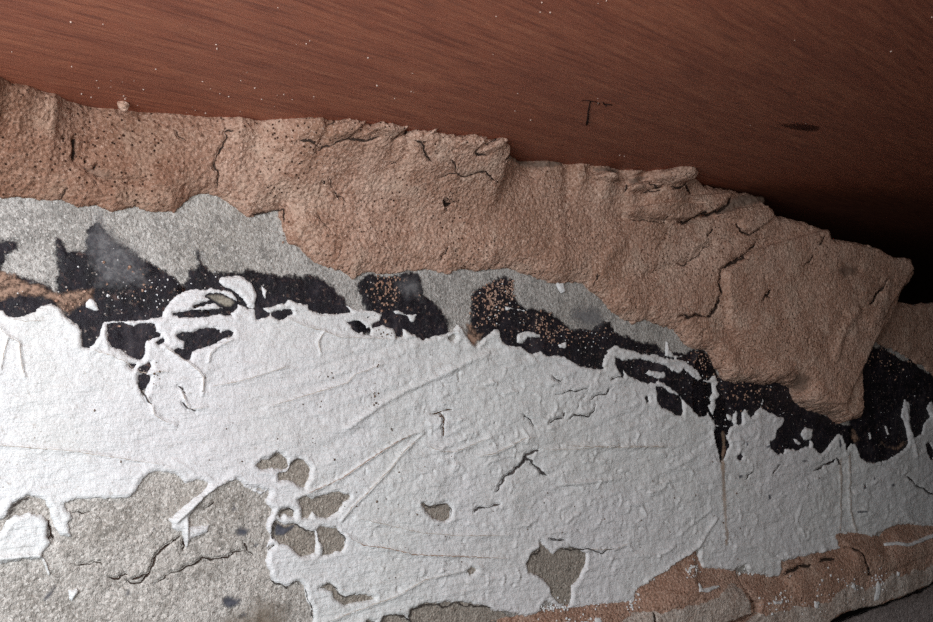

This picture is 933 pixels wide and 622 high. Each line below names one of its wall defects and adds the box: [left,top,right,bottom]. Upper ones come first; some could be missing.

crack [213,130,234,185]
crack [299,120,510,183]
crack [524,376,622,427]
crack [474,450,546,512]
crack [79,536,253,584]
peeling [0,452,350,622]
peeling [527,542,586,605]
spalling [622,563,933,622]